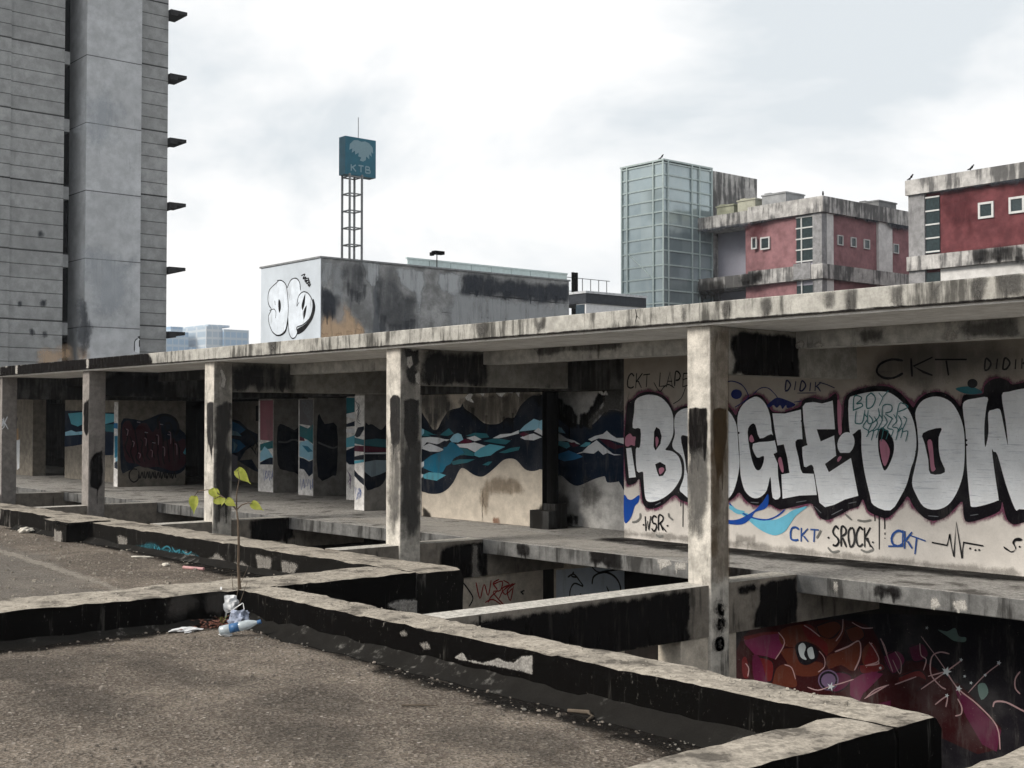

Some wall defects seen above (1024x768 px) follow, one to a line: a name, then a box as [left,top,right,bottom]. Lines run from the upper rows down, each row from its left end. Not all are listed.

water stain [0,246,1024,438]
water stain [341,432,688,578]
spalling [455,653,533,674]